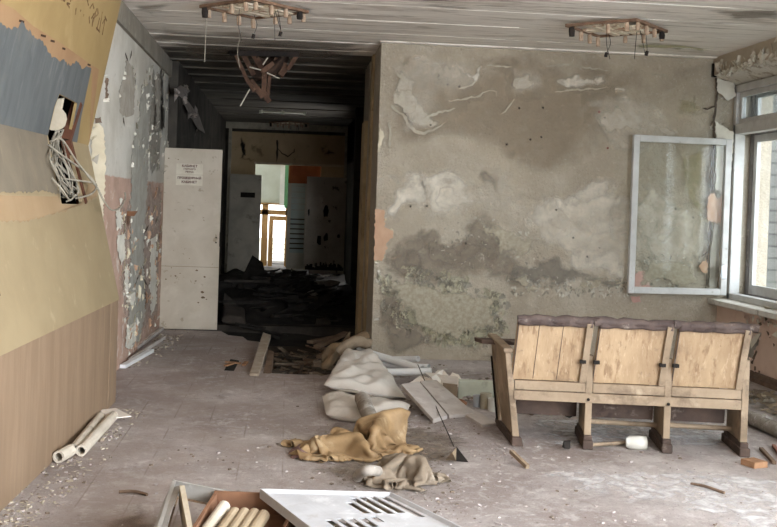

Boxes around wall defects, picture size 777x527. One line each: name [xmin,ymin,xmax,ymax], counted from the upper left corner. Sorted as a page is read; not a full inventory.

spalling [391,57,512,135]
spalling [513,75,532,89]
spalling [546,63,624,93]
peeling [711,43,777,101]
peeling [90,117,106,221]
peeling [103,51,205,356]
peeling [374,209,394,283]
damp [389,172,472,215]
damp [389,182,622,285]
peeling [692,121,735,289]
peeling [744,313,777,373]